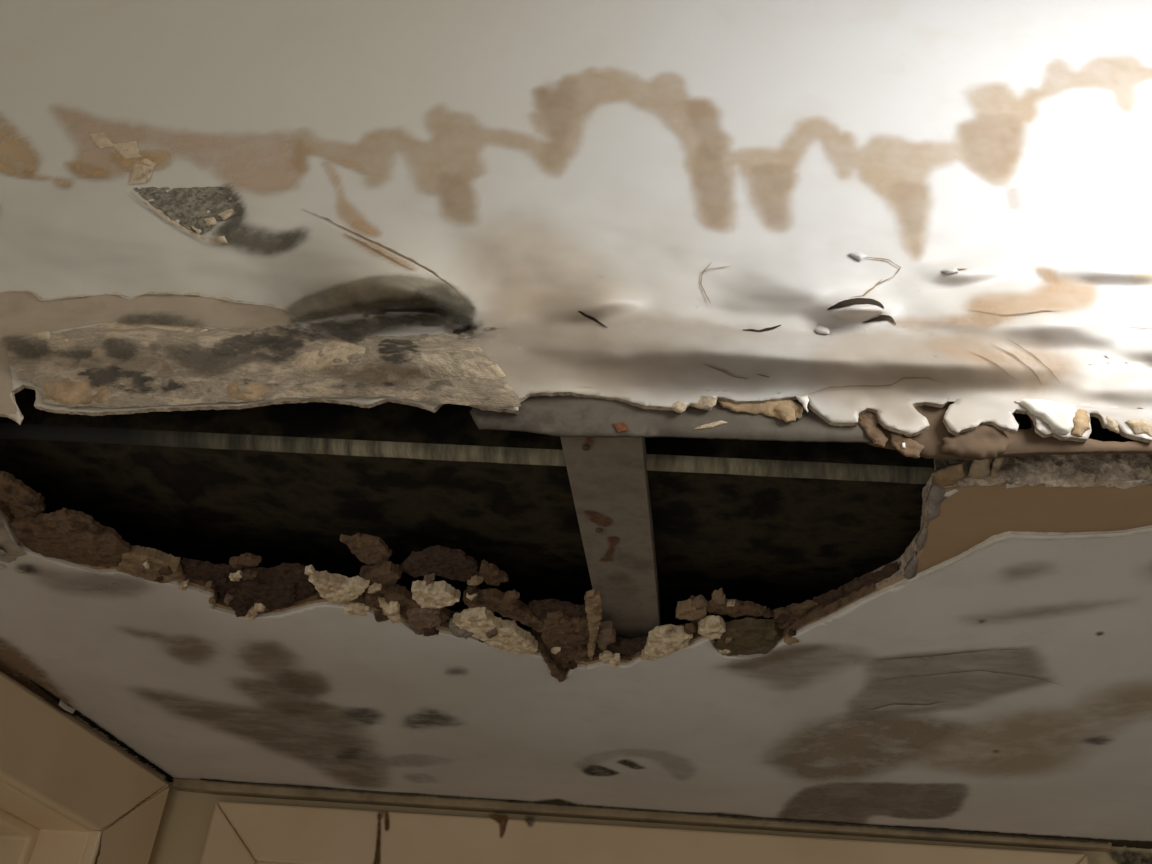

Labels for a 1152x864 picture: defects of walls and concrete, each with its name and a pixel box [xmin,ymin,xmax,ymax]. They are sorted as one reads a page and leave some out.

spalling [131,185,305,254]
mould [2,336,184,392]
mould [120,314,200,325]
spalling [0,290,521,414]
mould [150,276,495,376]
peeling [670,395,809,430]
peeling [1014,399,1152,437]
peeling [895,425,1152,587]
water stain [148,646,658,812]
water stain [686,648,1152,864]
rust [373,812,389,864]
rust [490,814,508,837]